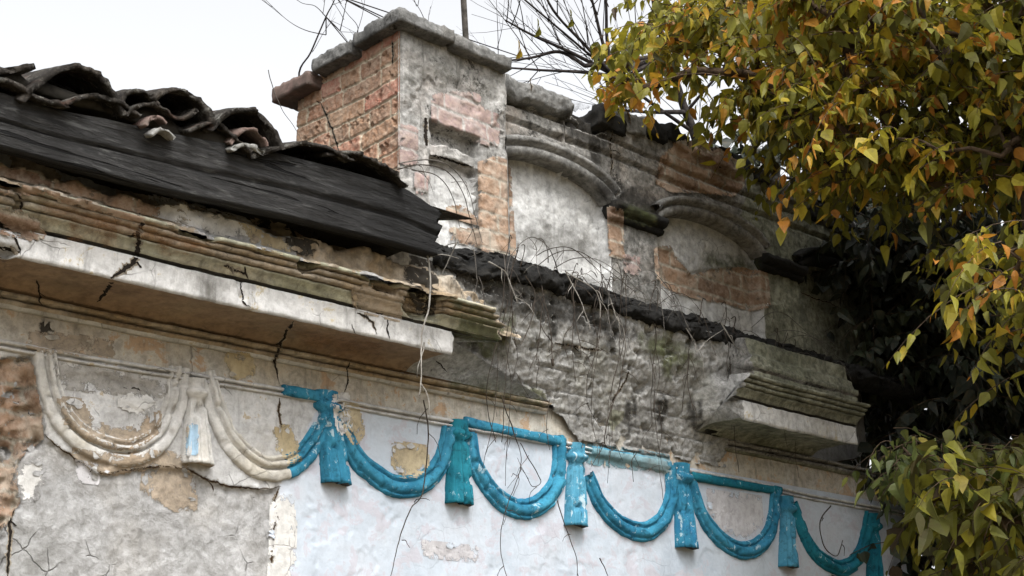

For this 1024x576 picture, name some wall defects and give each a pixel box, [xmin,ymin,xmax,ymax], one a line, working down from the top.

spalling [0,318,199,530]